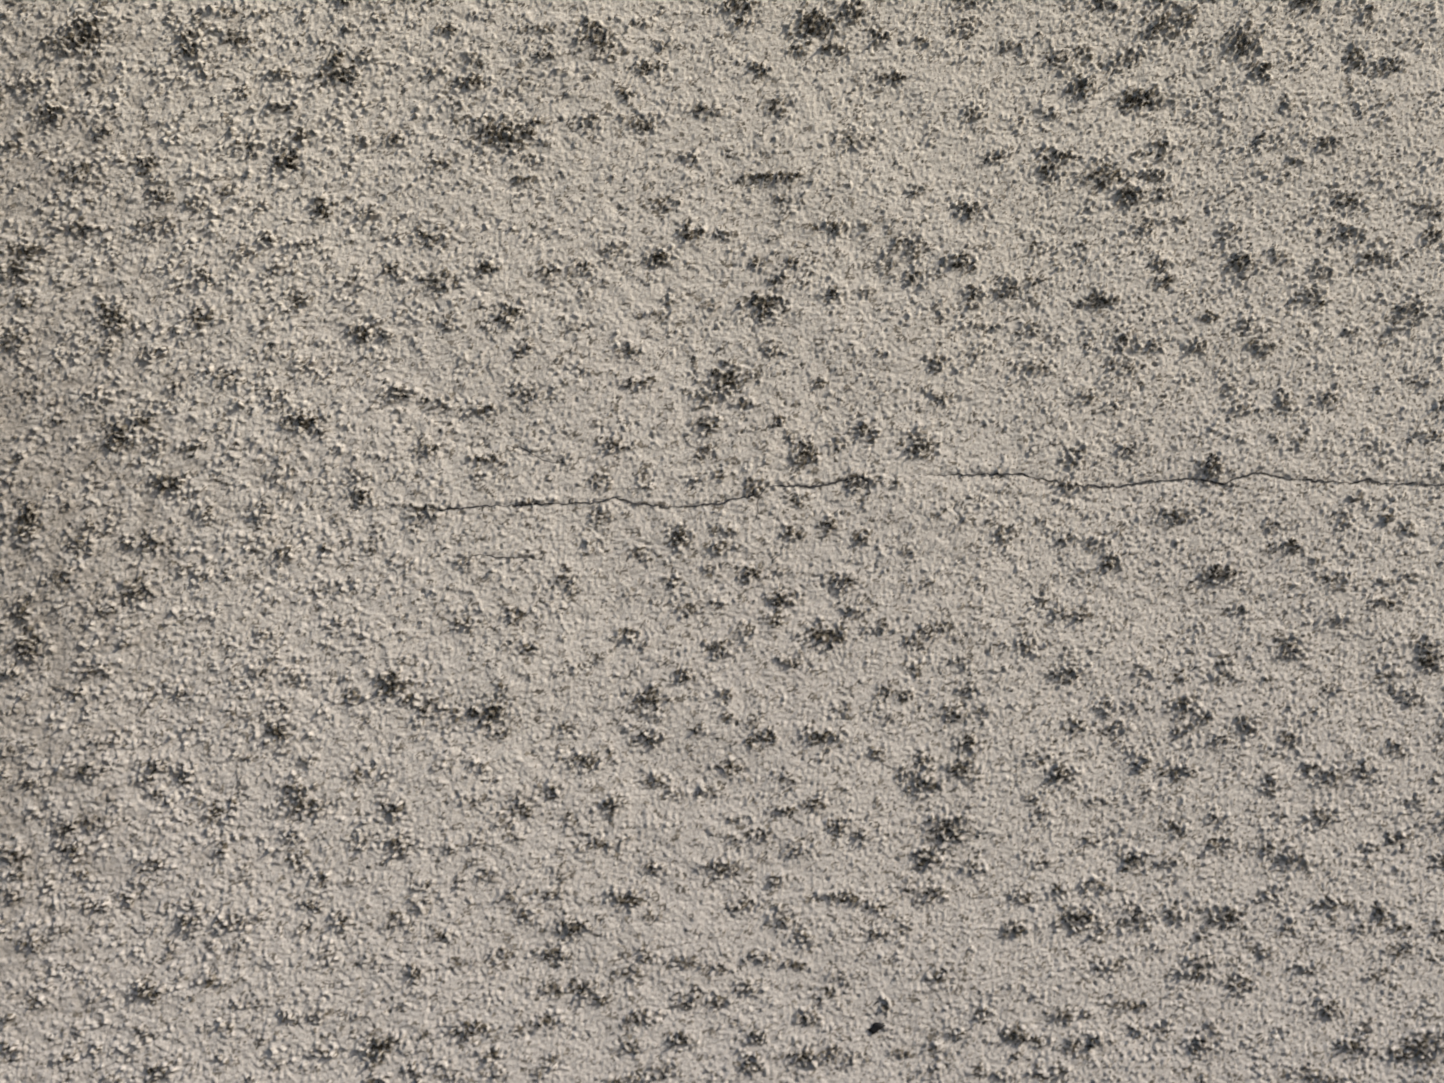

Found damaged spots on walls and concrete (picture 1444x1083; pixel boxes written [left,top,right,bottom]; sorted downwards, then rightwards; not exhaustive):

crack [509,445,565,463]
crack [911,472,1444,488]
crack [428,474,871,520]